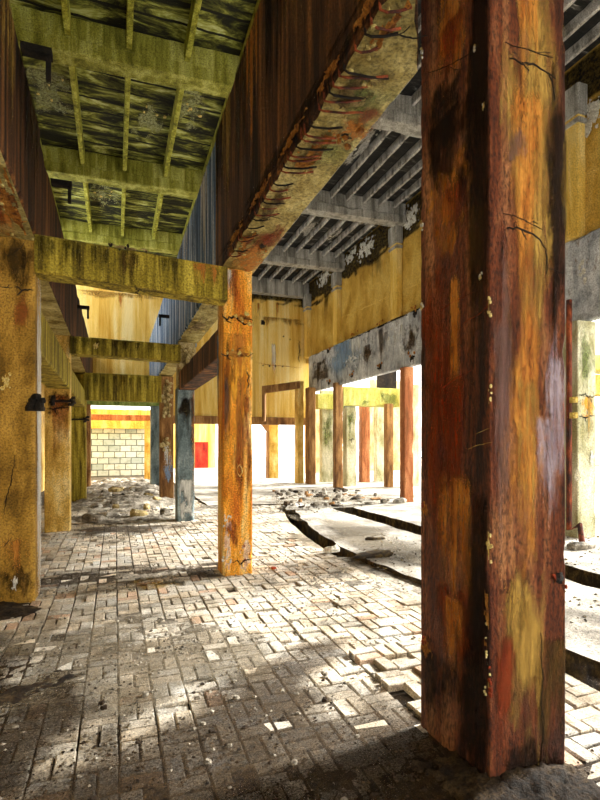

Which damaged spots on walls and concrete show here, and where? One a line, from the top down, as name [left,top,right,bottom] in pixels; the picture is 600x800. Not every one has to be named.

leakage [162,117,223,274]
crack [222,313,253,325]
leakage [235,48,246,159]
spalling [228,51,389,257]
leakage [252,225,391,315]
leakage [403,193,422,240]
crack [505,42,556,99]
rust [504,0,558,551]
crack [504,213,563,279]
rust [228,323,251,490]
rust [402,269,470,661]
rust [498,576,542,715]